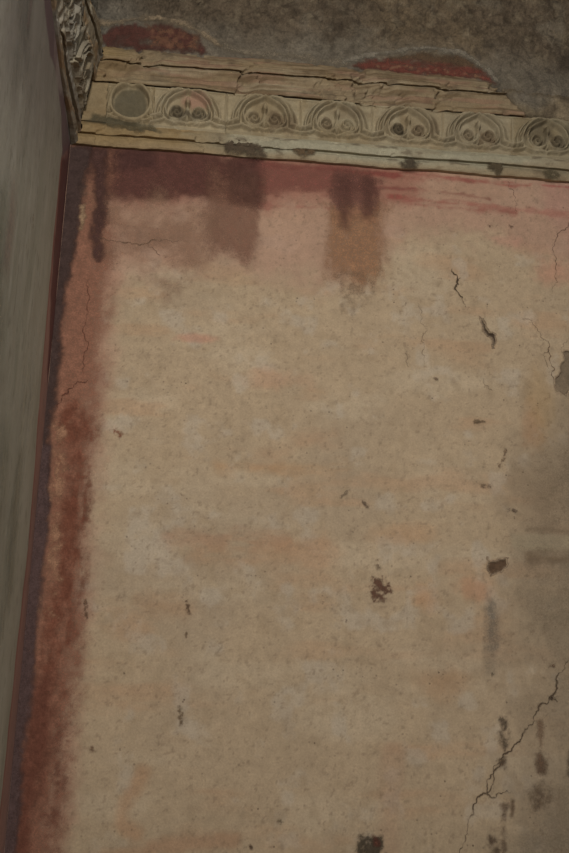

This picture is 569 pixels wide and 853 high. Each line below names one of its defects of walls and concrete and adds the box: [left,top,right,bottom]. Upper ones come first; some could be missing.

damp [74,143,371,263]
flaking render [555,350,569,396]
flaking render [370,577,392,602]
crack [459,661,568,853]
flaking render [357,835,383,853]